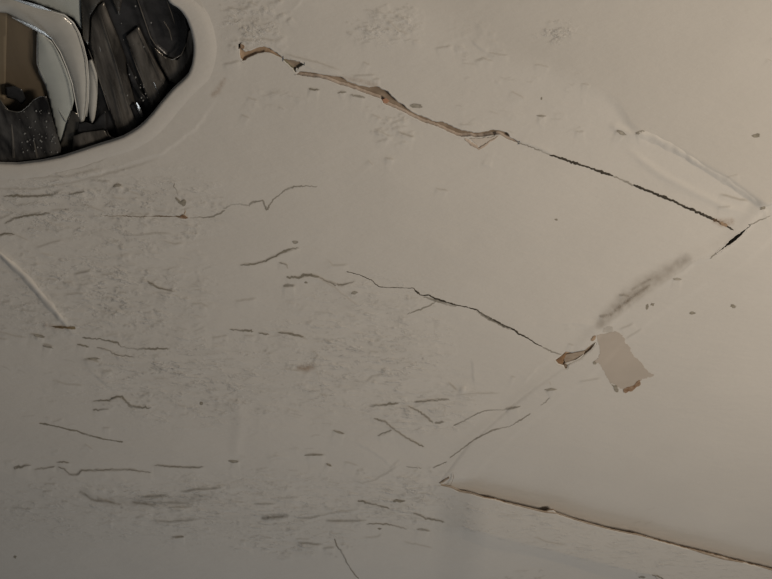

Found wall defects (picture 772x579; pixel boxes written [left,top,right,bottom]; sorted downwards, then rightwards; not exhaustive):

crack [238,43,763,258]
crack [109,184,225,219]
crack [231,329,303,337]
crack [246,248,559,354]
peeling [554,326,654,393]